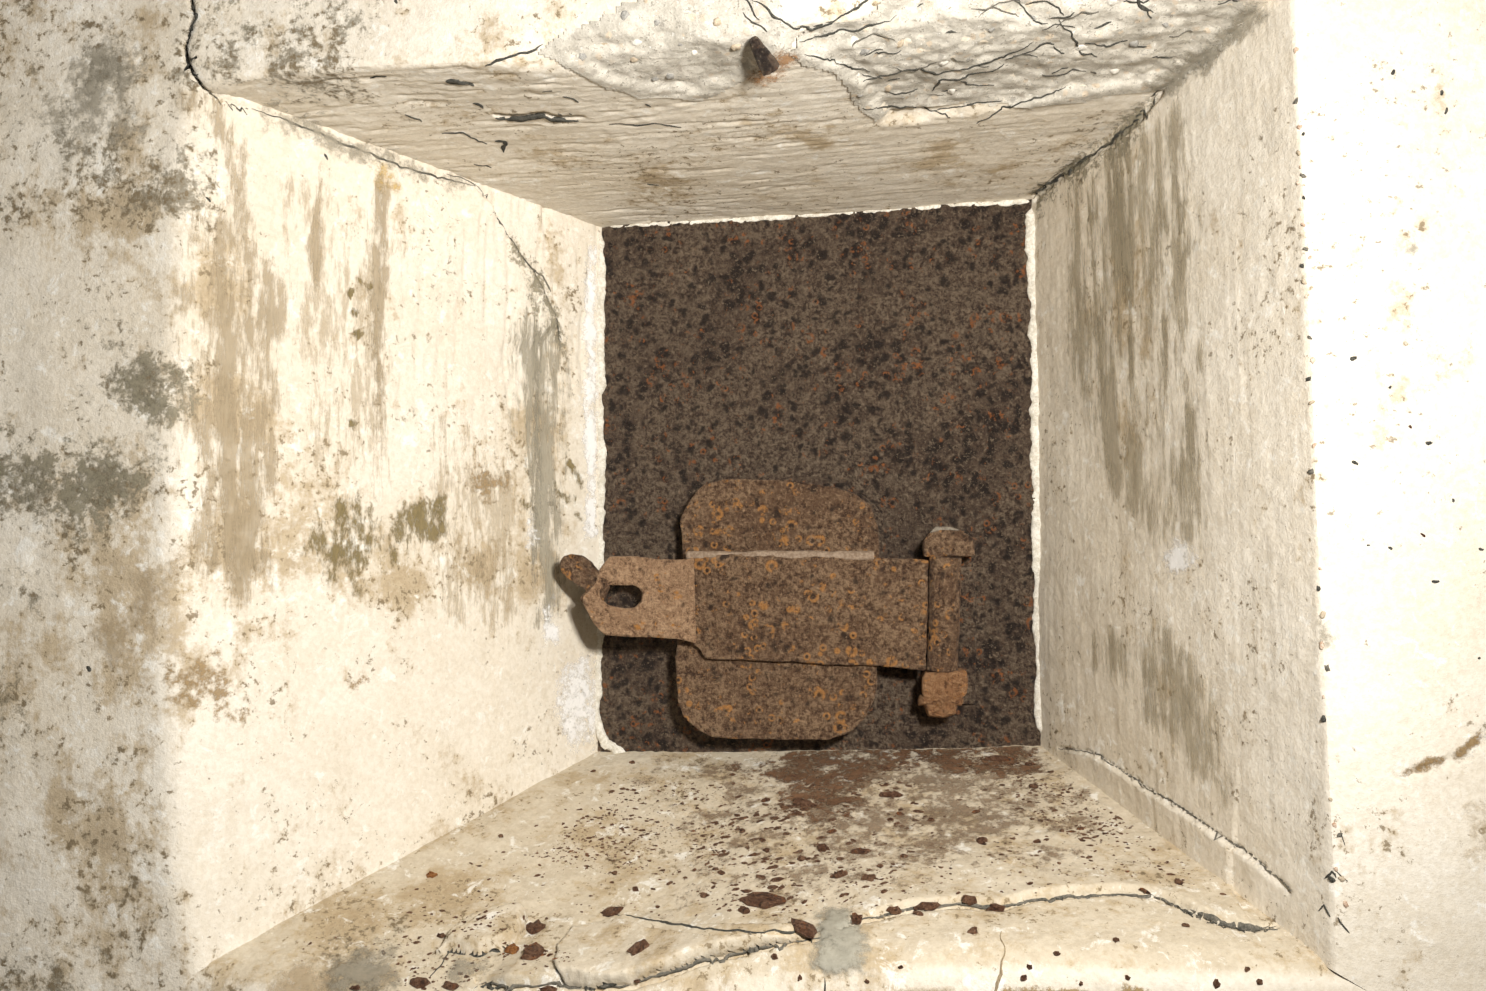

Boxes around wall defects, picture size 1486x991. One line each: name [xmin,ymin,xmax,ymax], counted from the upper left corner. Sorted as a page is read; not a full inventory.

water stain [170,92,286,600]
water stain [262,102,426,419]
crack [184,0,562,342]
water stain [509,236,569,627]
water stain [1029,6,1267,543]
rust [410,977,459,991]
rust [505,919,546,960]
rust [627,939,650,956]
rust [738,892,817,939]
crack [430,893,1278,991]
rust [723,746,1046,825]
crack [1059,748,1349,933]